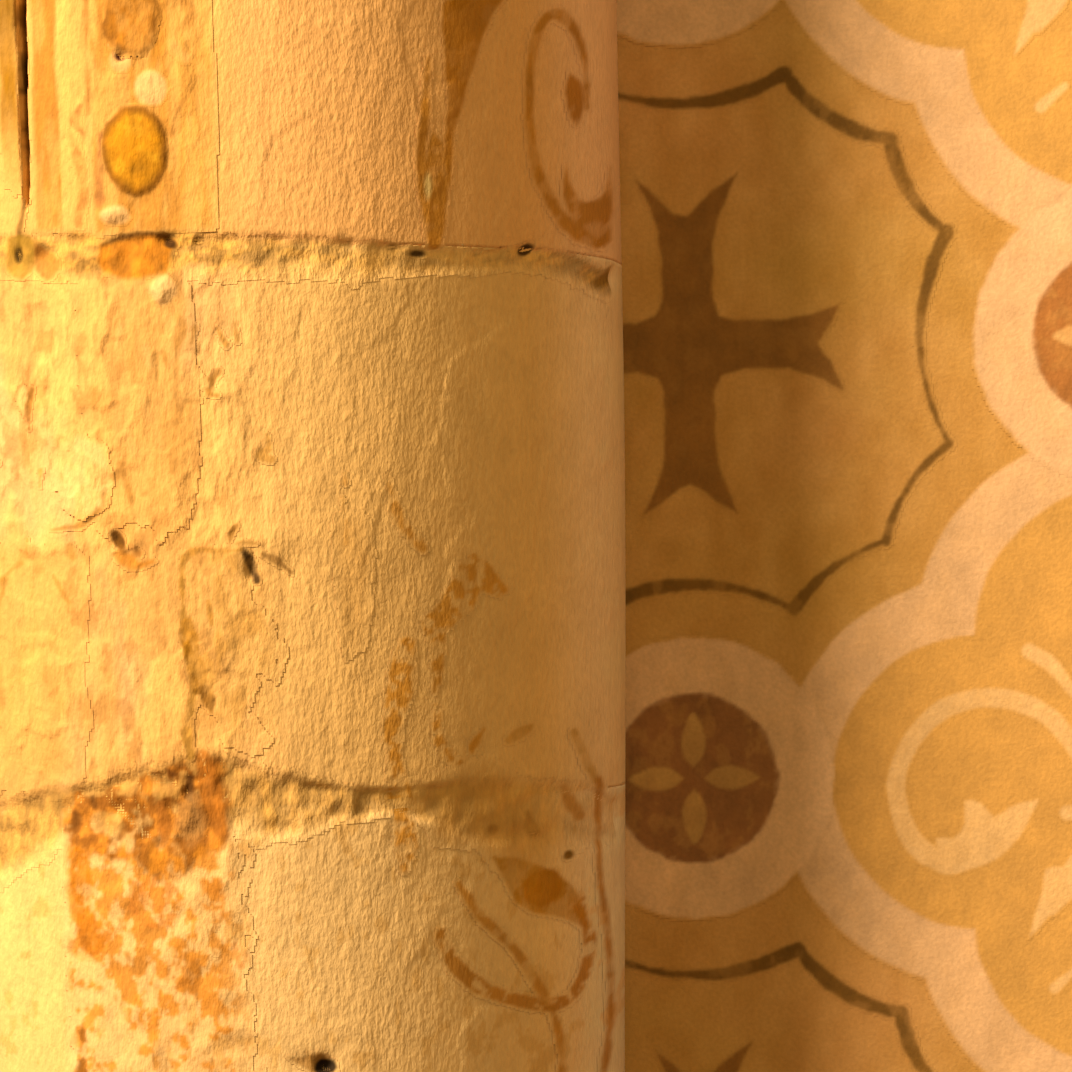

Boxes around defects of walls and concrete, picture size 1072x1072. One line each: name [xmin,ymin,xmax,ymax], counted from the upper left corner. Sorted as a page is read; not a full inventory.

crack [13,0,31,232]
water stain [410,752,564,882]
peeling [60,833,266,1072]